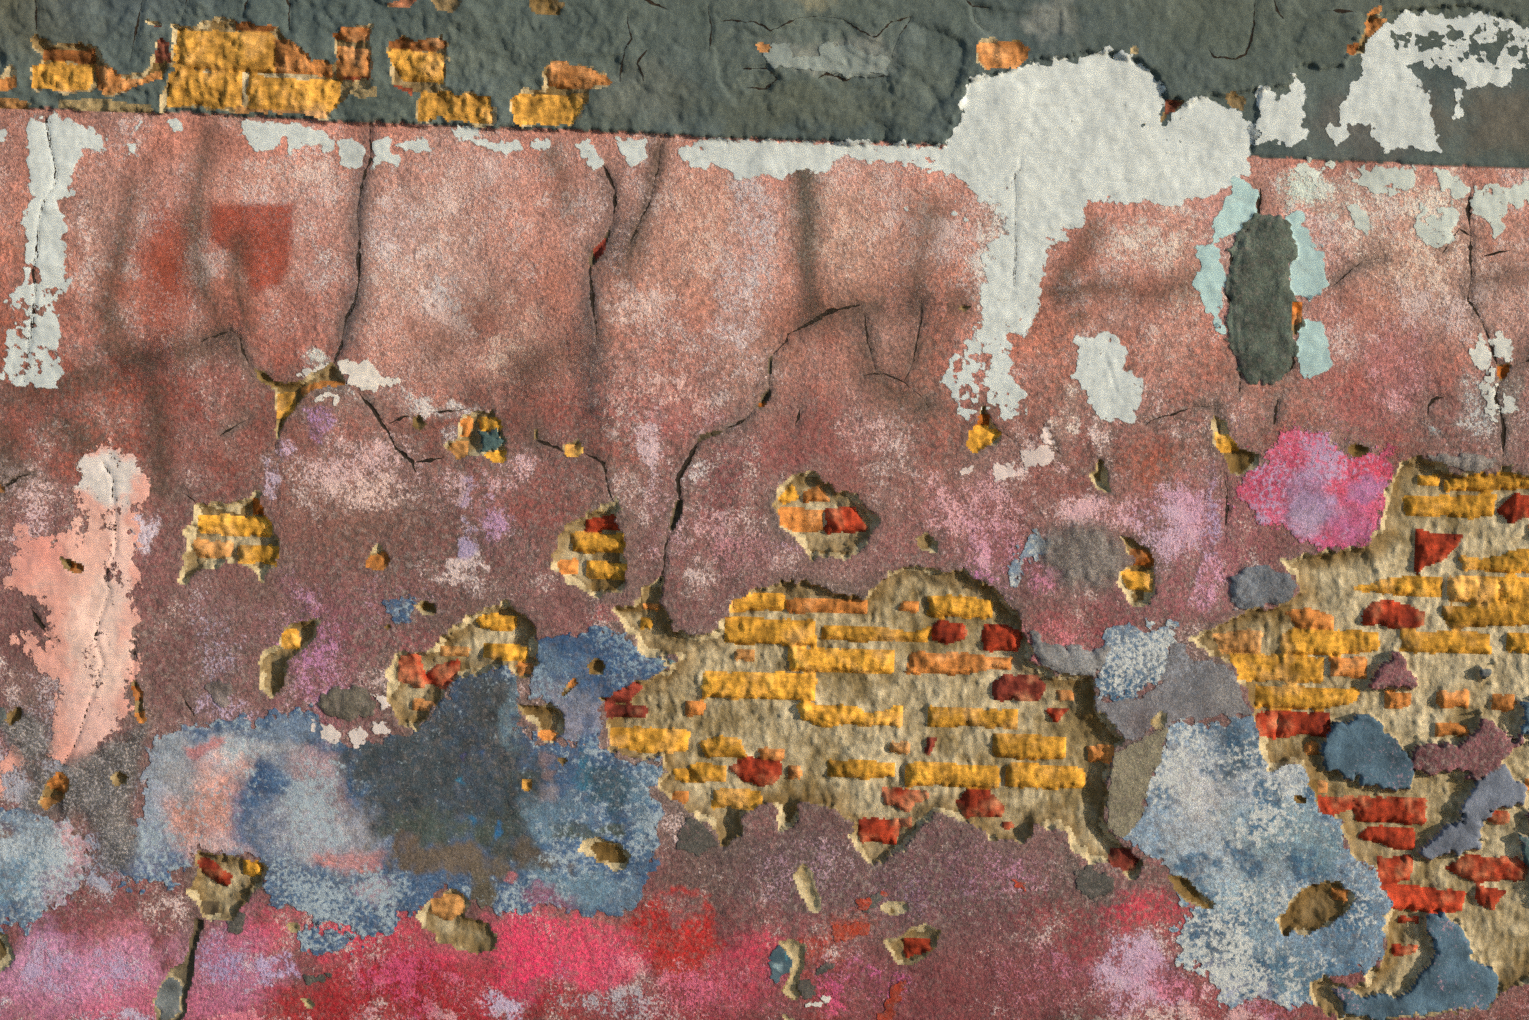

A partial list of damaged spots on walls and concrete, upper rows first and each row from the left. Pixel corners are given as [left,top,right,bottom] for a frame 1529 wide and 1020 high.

flaking render [387,0,462,13]
flaking render [529,0,565,15]
flaking render [0,16,612,389]
crack [334,129,373,363]
crack [359,393,464,473]
crack [589,146,661,340]
peeling [615,136,648,167]
crack [660,305,928,583]
peeling [675,5,1529,482]
crack [1443,194,1529,456]
flaking render [0,409,1529,1020]
crack [152,917,204,1020]